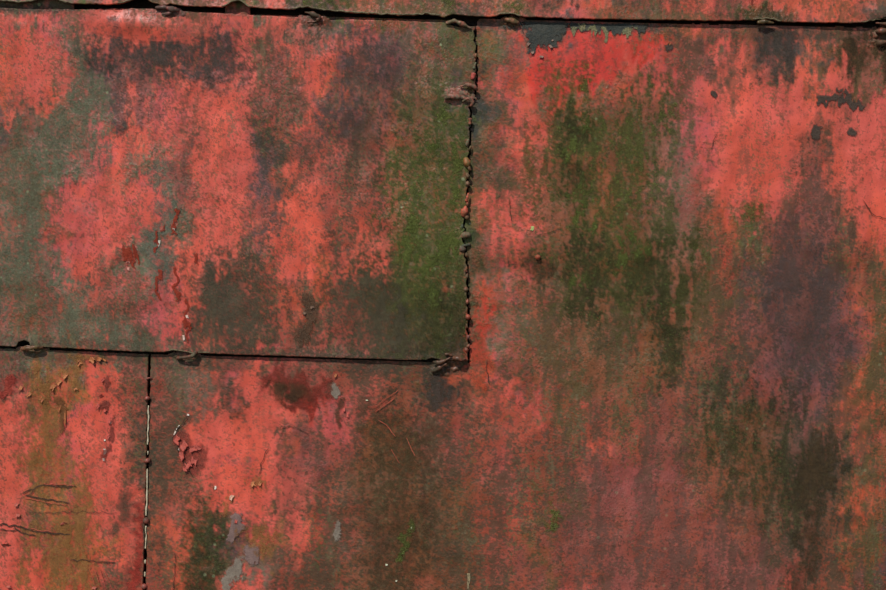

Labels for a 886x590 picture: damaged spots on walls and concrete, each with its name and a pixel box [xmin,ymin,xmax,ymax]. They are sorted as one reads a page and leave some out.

peeling [816,88,865,111]
corrosion [122,243,140,269]
corrosion [171,266,192,343]
leakage [323,267,419,358]
peeling [17,354,106,506]
peeling [95,375,114,461]
peeling [173,425,207,474]
corrosion [261,365,332,420]
peeling [221,495,278,590]